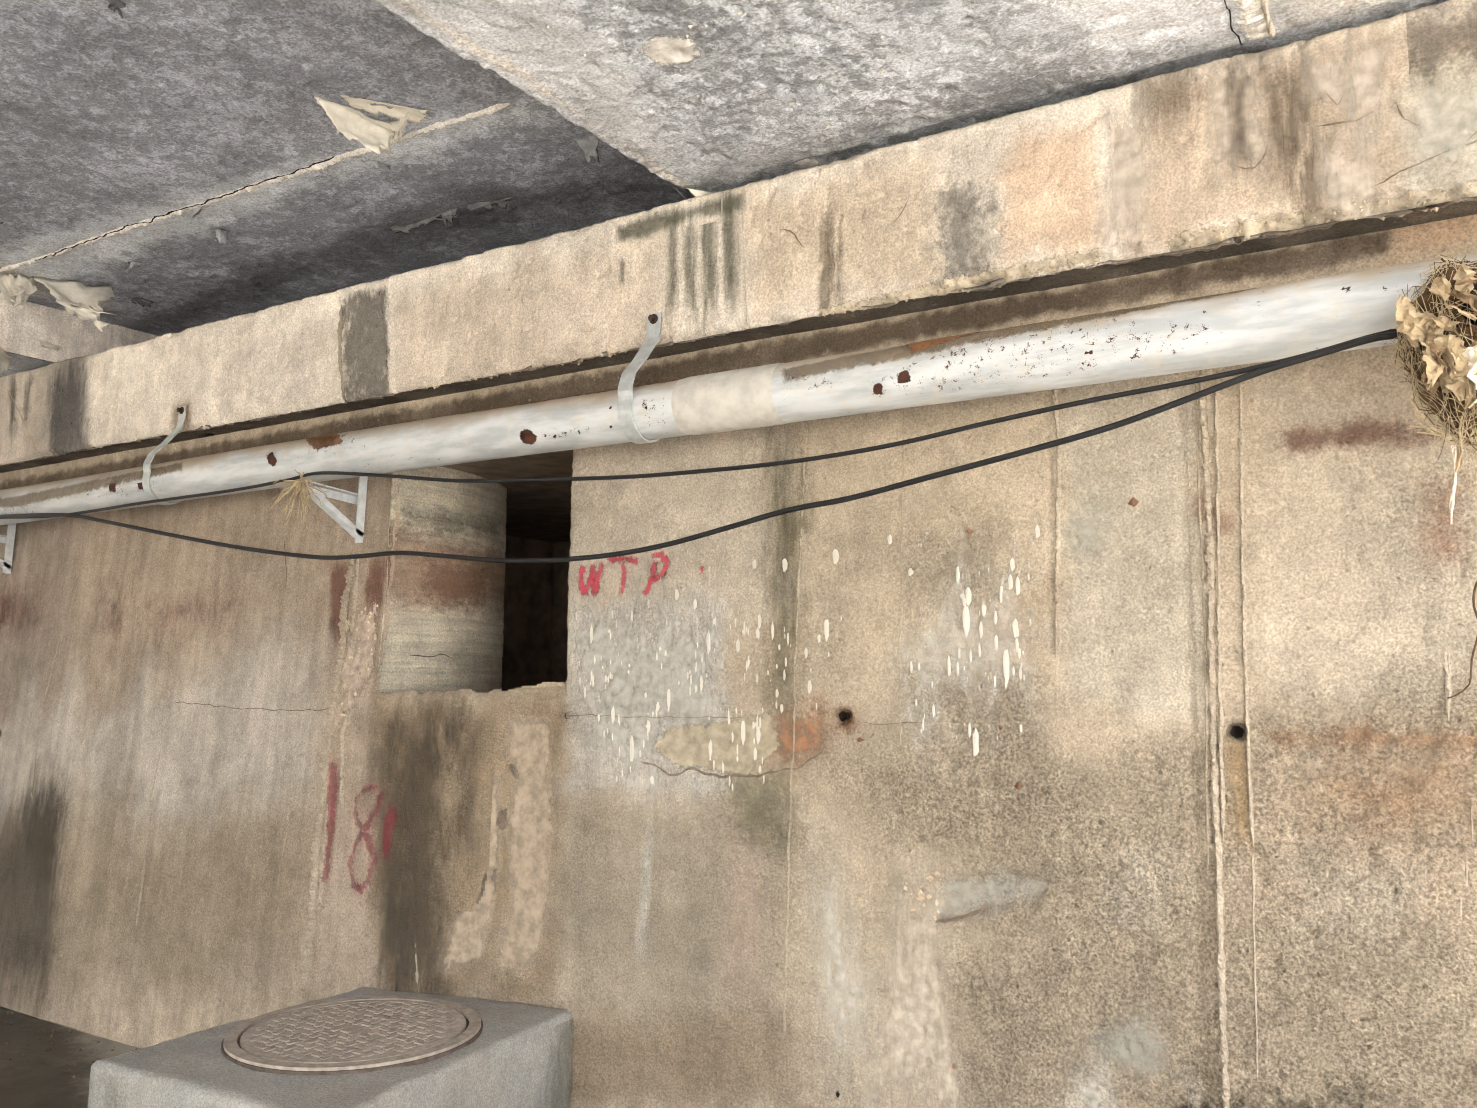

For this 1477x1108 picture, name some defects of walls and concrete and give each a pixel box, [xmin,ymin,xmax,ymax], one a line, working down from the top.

peeling [314,95,430,170]
peeling [576,136,600,165]
peeling [211,228,230,244]
peeling [390,197,513,234]
damp [670,202,733,305]
spalling [1166,181,1477,253]
peeling [0,273,153,332]
spalling [903,871,995,922]